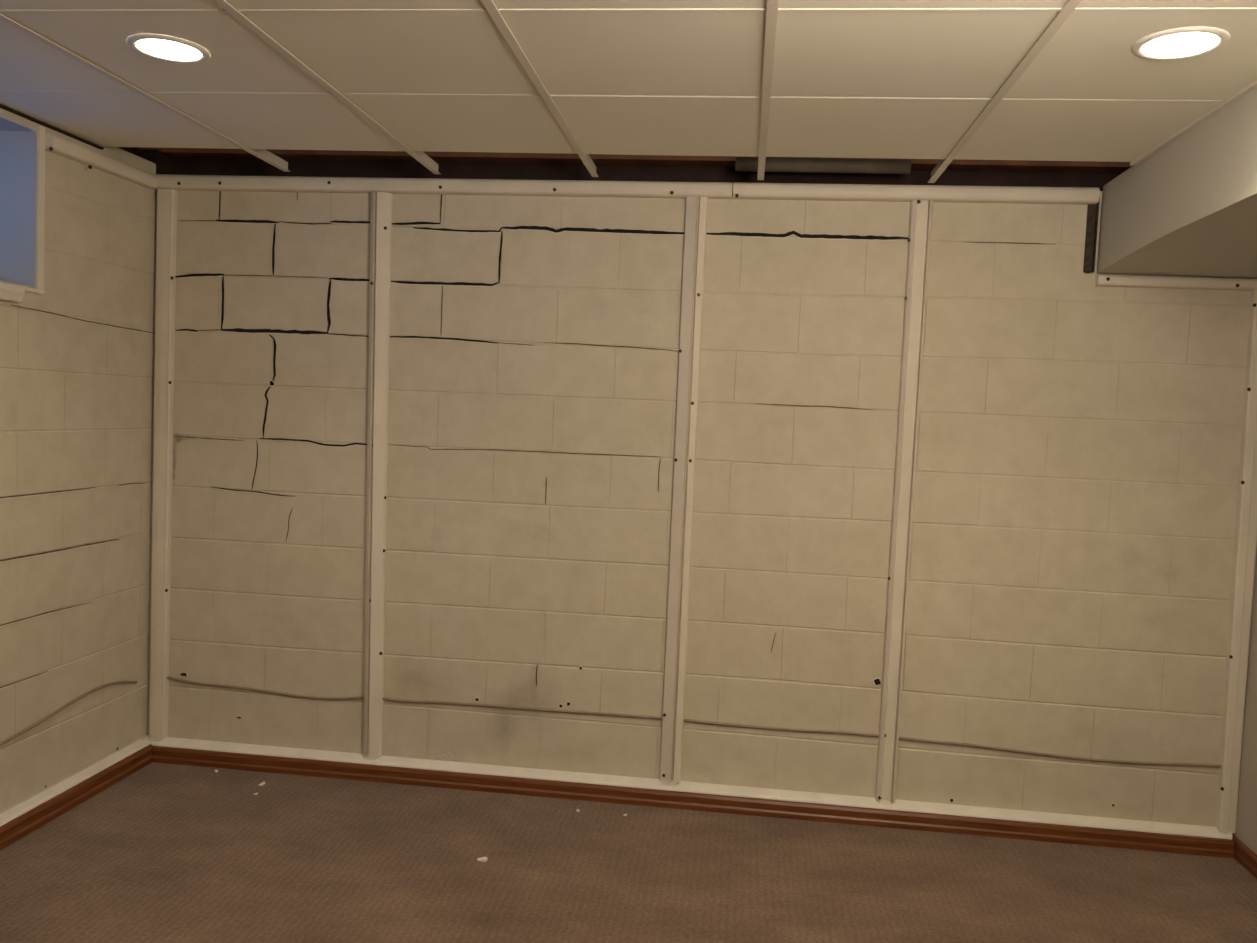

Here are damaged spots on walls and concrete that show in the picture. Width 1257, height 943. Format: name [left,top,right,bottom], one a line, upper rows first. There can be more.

crack [0,191,909,541]
crack [0,539,119,562]
crack [0,602,93,627]
crack [0,671,48,689]